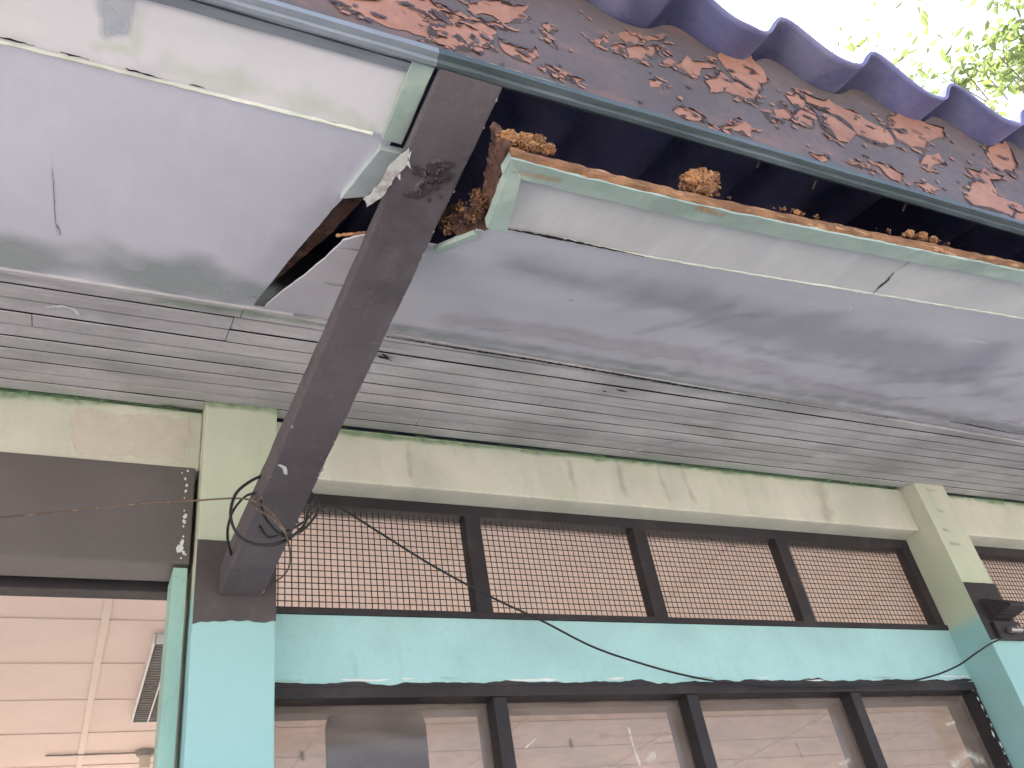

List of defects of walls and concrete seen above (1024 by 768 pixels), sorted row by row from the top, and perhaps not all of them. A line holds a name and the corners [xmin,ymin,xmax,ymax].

peeling [329,0,588,88]
peeling [582,27,955,194]
crack [52,171,60,234]
peeling [958,140,1024,221]
peeling [176,470,189,559]